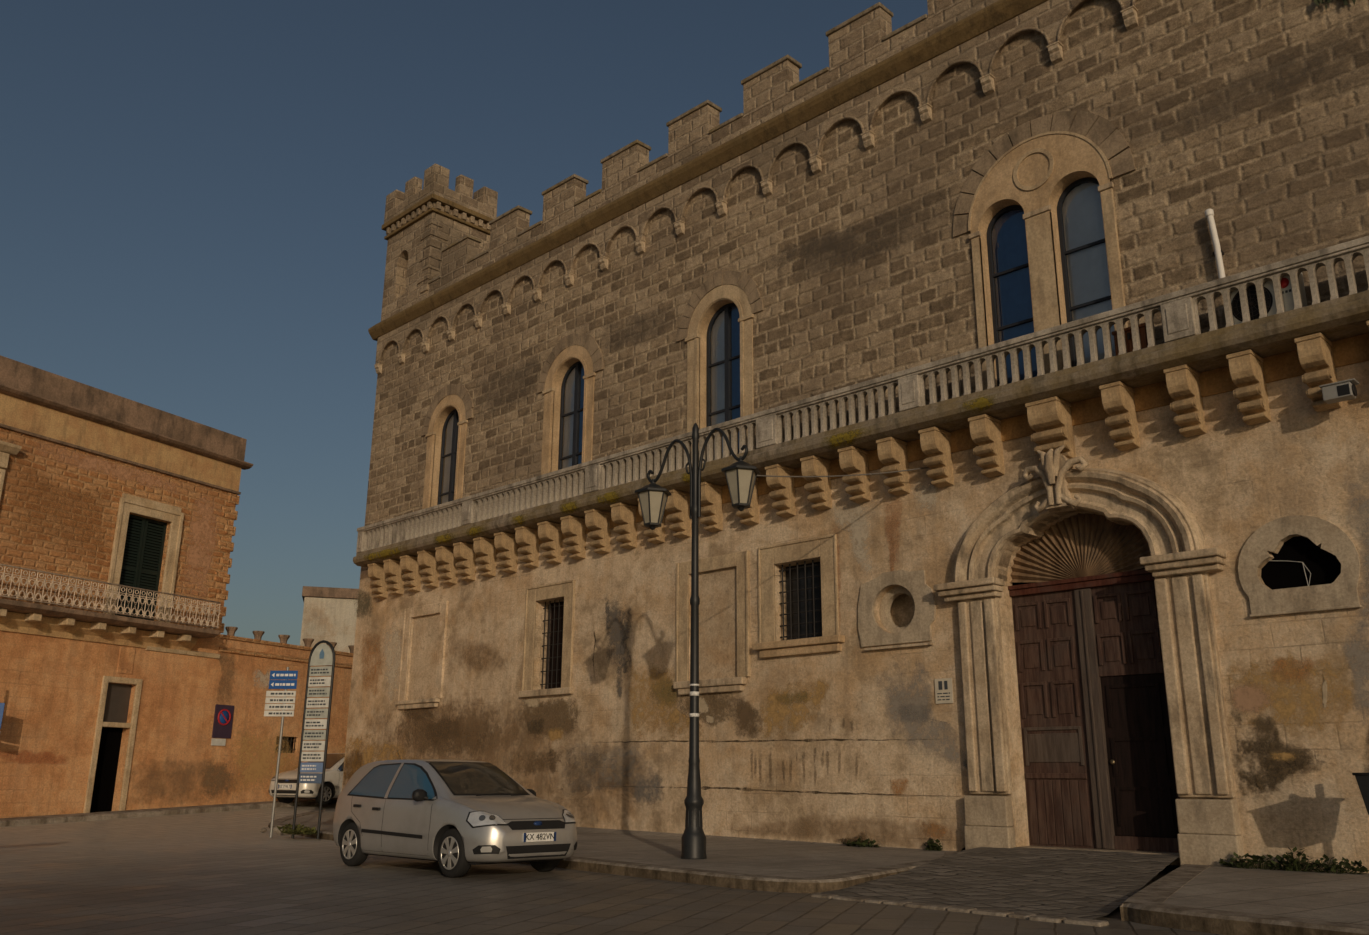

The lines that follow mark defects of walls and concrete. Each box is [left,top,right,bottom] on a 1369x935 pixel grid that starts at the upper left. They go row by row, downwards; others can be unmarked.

leakage [605,603,700,732]
leakage [343,708,635,813]